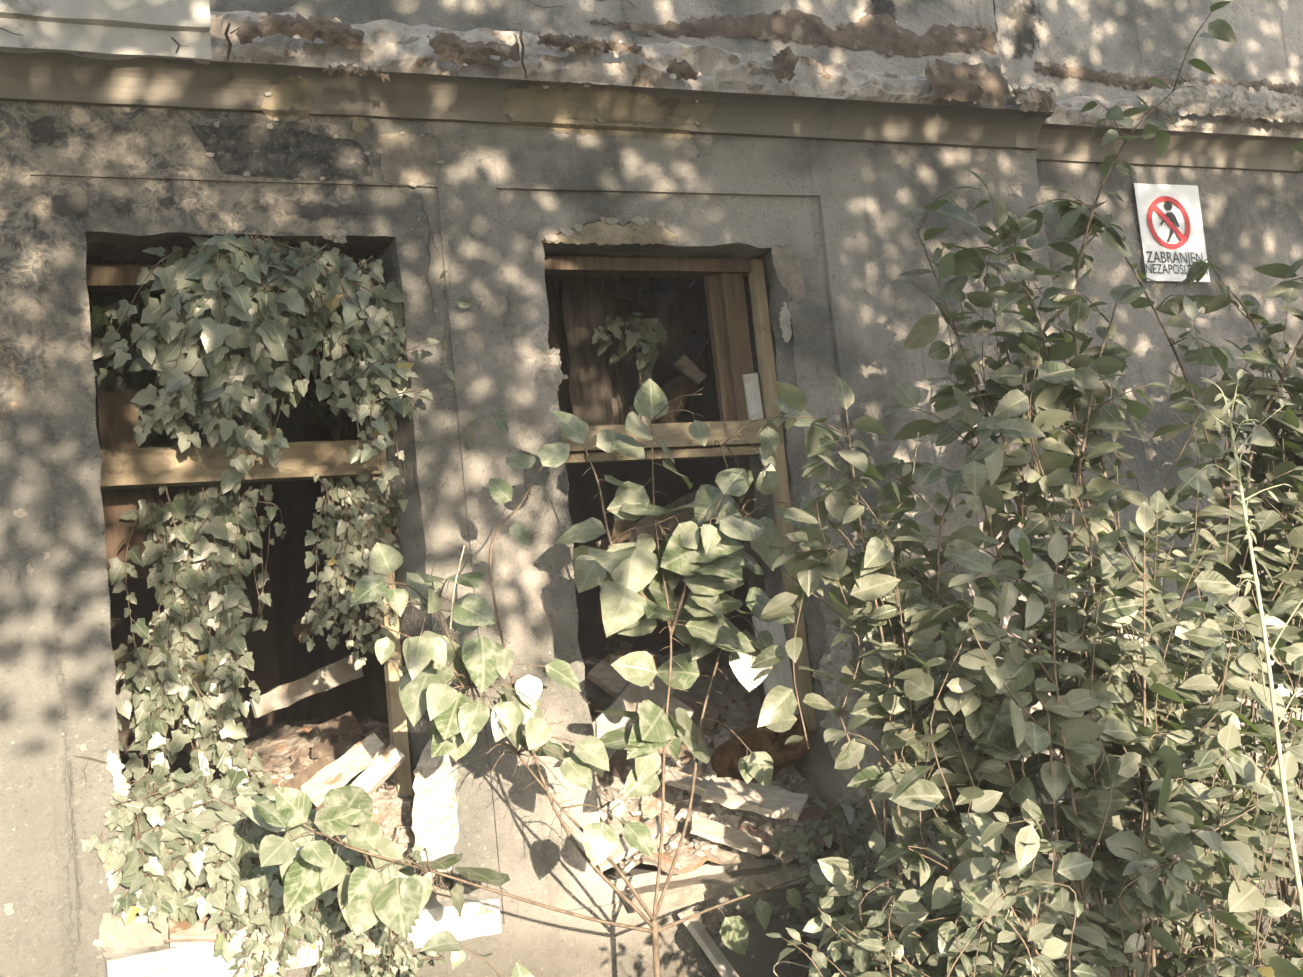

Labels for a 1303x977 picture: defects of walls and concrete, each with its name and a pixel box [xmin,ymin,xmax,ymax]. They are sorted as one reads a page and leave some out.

flaking render [585,9,998,58]
flaking render [1035,60,1303,97]
peeling [500,82,715,140]
water stain [29,116,56,148]
flaking render [191,75,383,181]
water stain [51,191,89,220]
water stain [157,194,175,211]
water stain [253,198,367,222]
peeling [544,216,678,246]